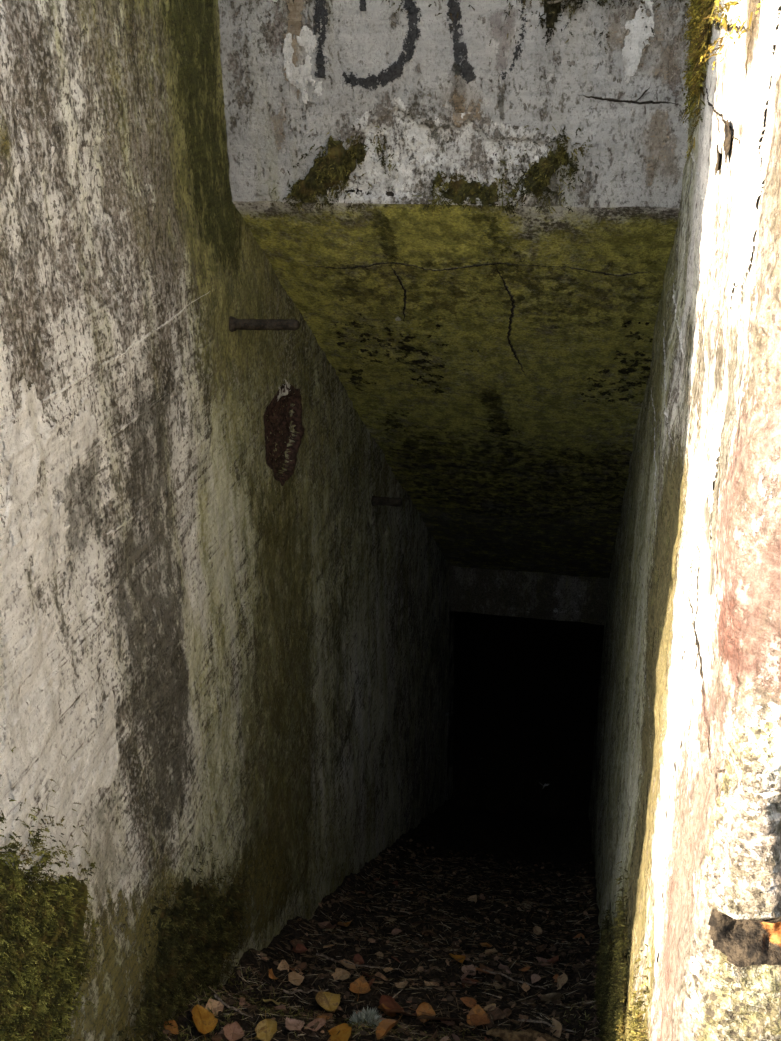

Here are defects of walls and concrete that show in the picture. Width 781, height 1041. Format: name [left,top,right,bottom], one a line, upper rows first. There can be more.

peeling [283,26,322,104]
peeling [622,0,656,84]
crack [713,19,755,75]
crack [705,85,740,144]
rust [229,316,300,332]
crack [302,262,648,376]
crack [688,595,726,803]
spalling [708,908,781,967]